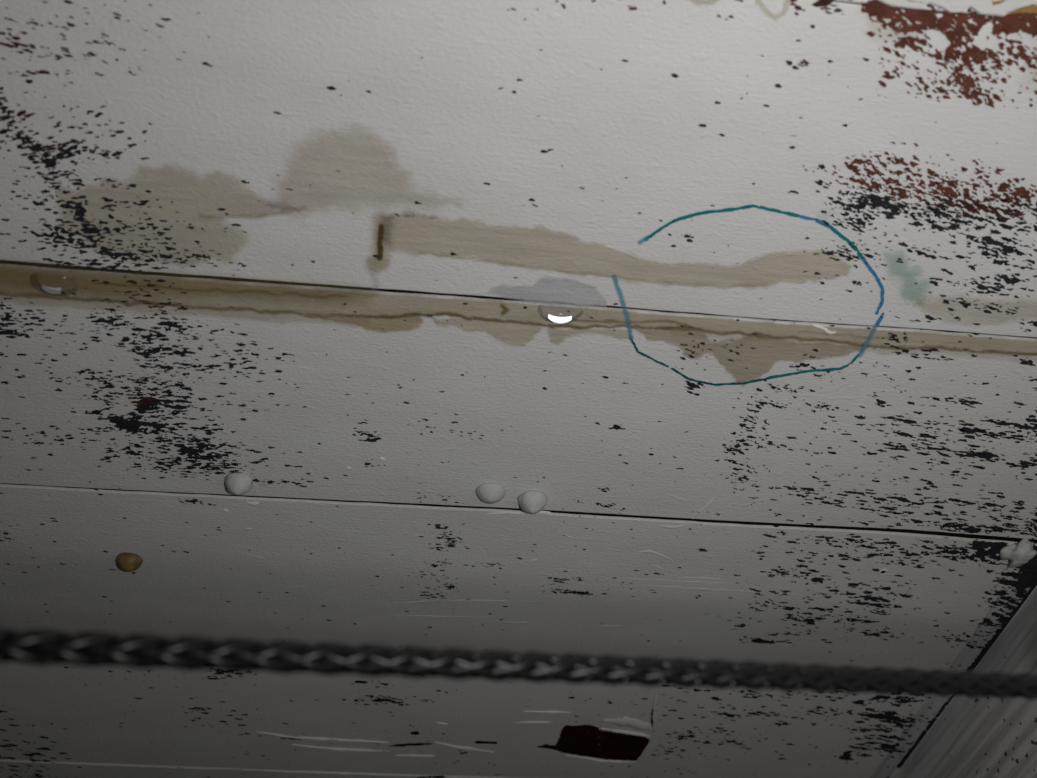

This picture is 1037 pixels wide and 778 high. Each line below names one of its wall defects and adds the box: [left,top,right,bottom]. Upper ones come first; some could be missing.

damp [0,0,126,98]
damp [0,87,1037,671]